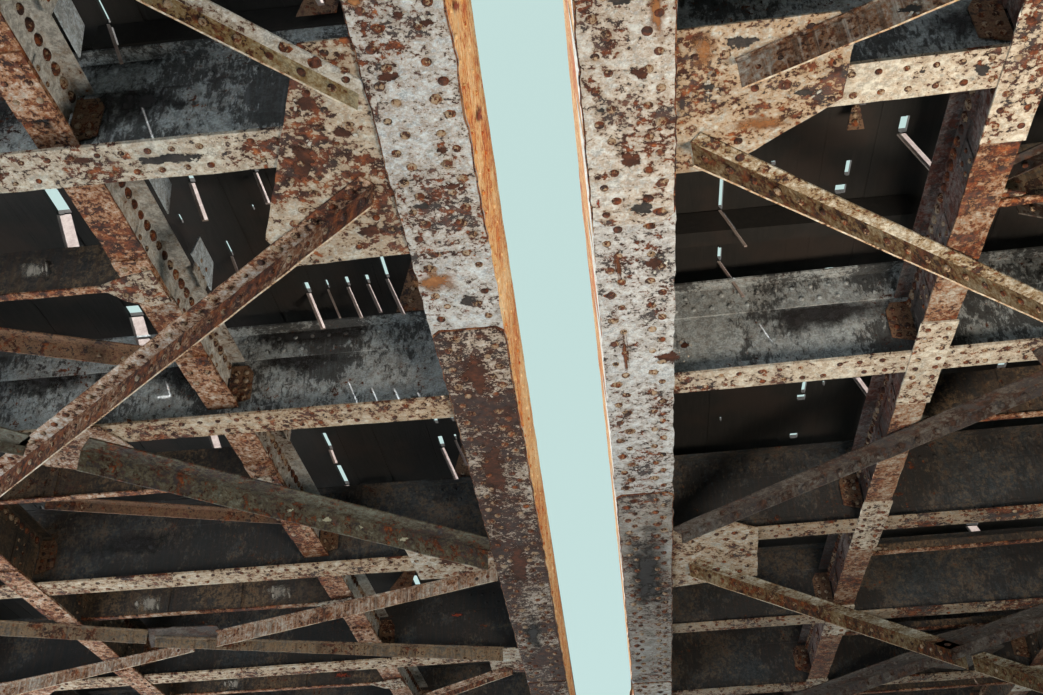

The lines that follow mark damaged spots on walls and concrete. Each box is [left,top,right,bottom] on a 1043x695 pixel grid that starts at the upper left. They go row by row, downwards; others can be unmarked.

rust [388,11,435,32]
rust [374,68,402,82]
rust [624,61,654,87]
rust [333,127,362,142]
rust [55,157,103,167]
rust [280,140,326,186]
rust [621,145,649,174]
rust [355,221,384,241]
rust [643,256,668,274]
rust [416,273,454,290]
rust [653,339,692,368]
rust [478,438,509,508]